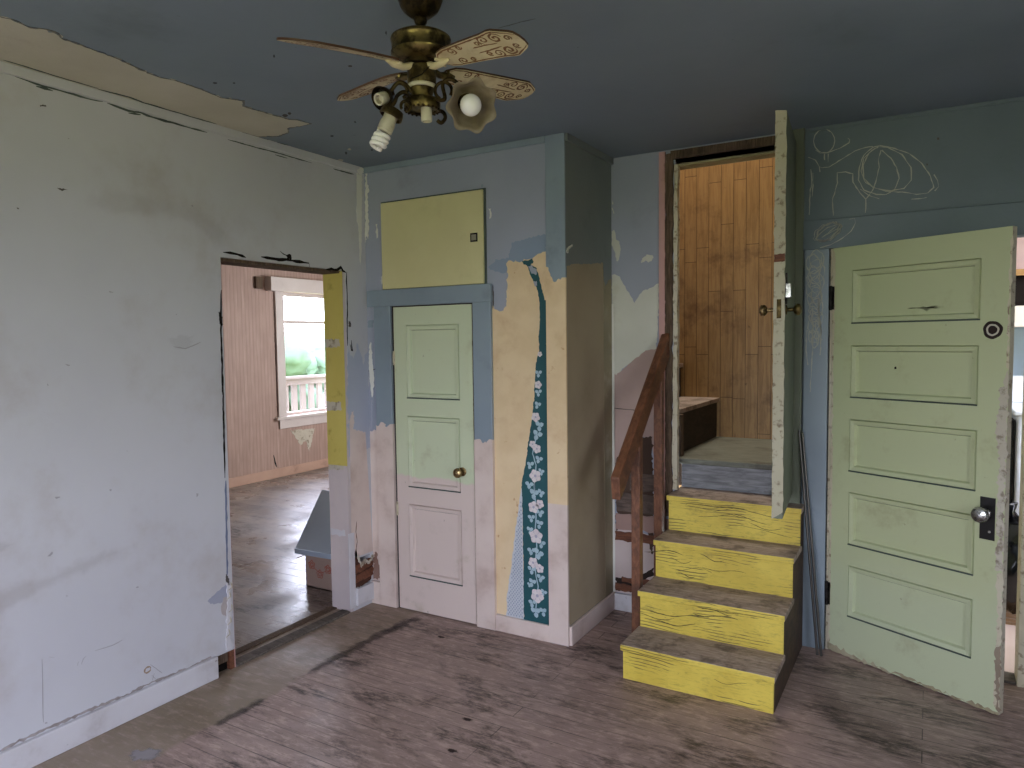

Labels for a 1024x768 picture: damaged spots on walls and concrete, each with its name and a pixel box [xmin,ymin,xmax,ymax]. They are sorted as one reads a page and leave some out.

peeling [0,16,311,137]
crack [223,251,353,351]
peeling [611,230,621,261]
peeling [326,401,399,608]
peeling [474,245,669,647]